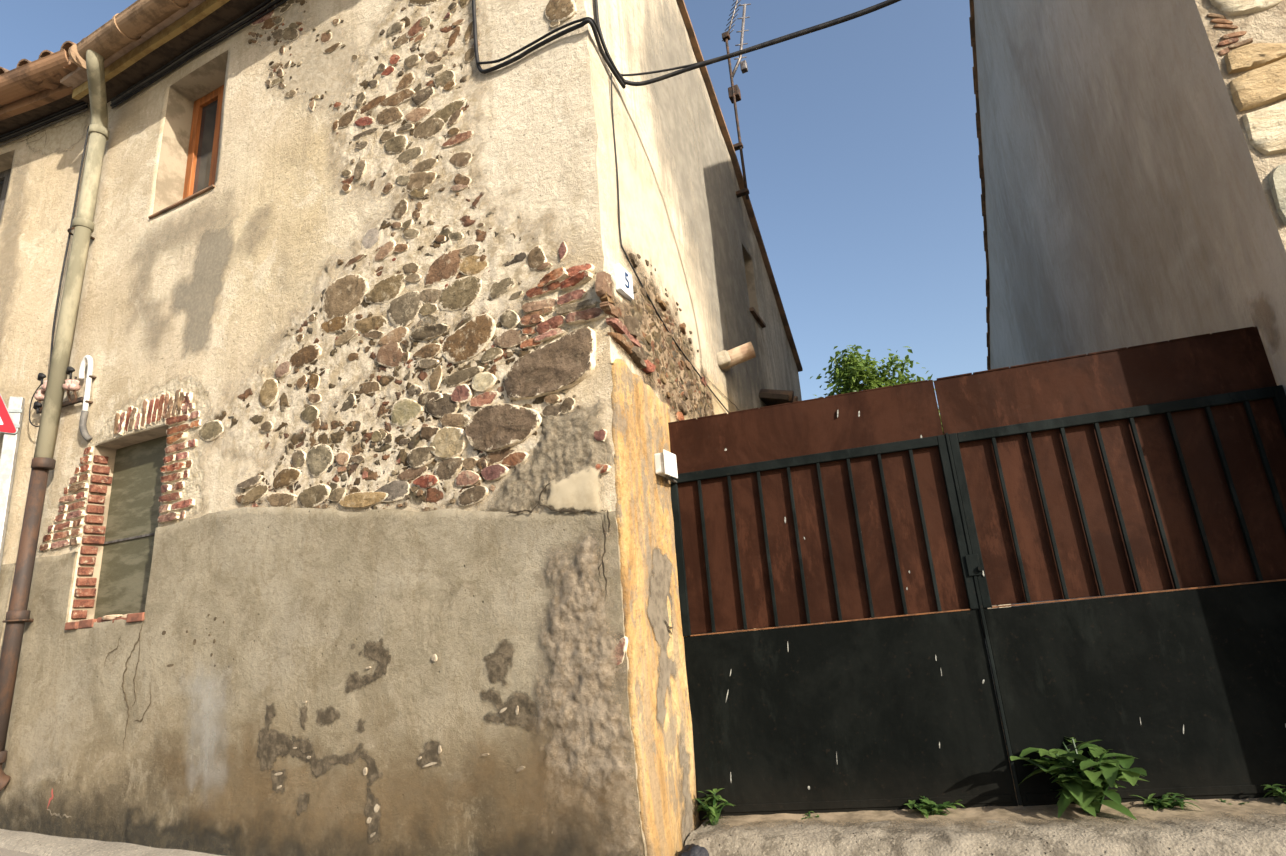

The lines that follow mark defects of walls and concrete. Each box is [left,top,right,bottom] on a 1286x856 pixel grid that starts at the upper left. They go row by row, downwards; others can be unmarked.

flaking render [37,0,715,555]
crack [104,614,151,750]
peeling [345,638,391,693]
peeling [480,639,538,731]
peeling [257,701,382,843]